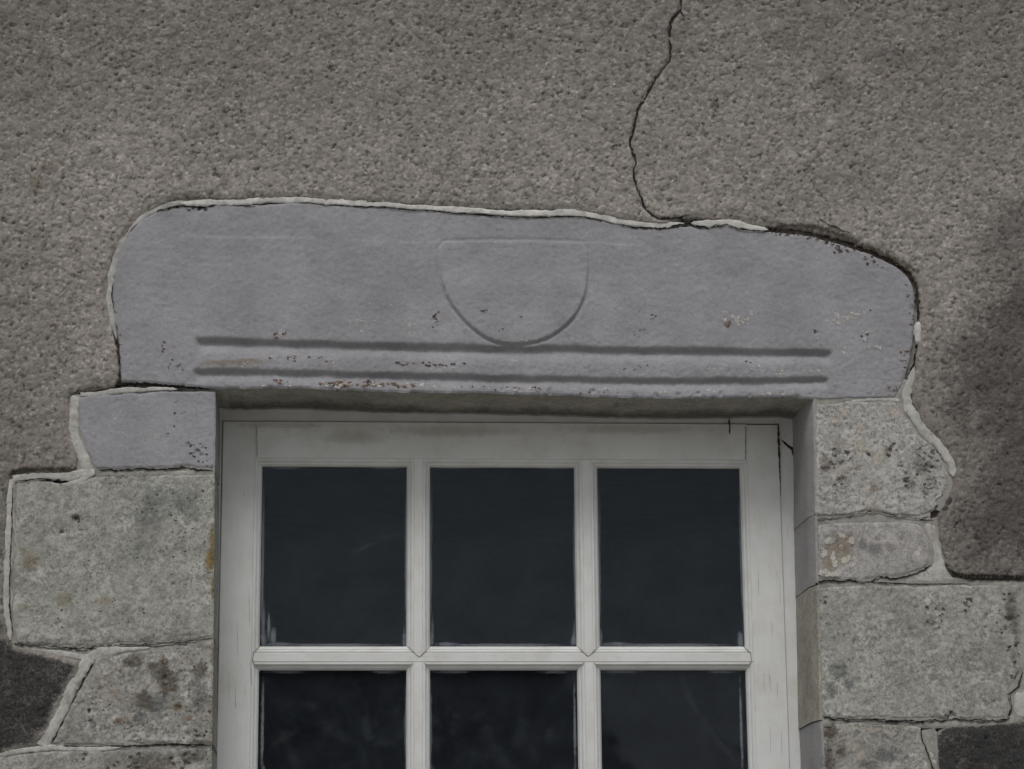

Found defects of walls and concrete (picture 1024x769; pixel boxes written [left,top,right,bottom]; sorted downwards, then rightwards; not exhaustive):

crack [300,0,920,380]